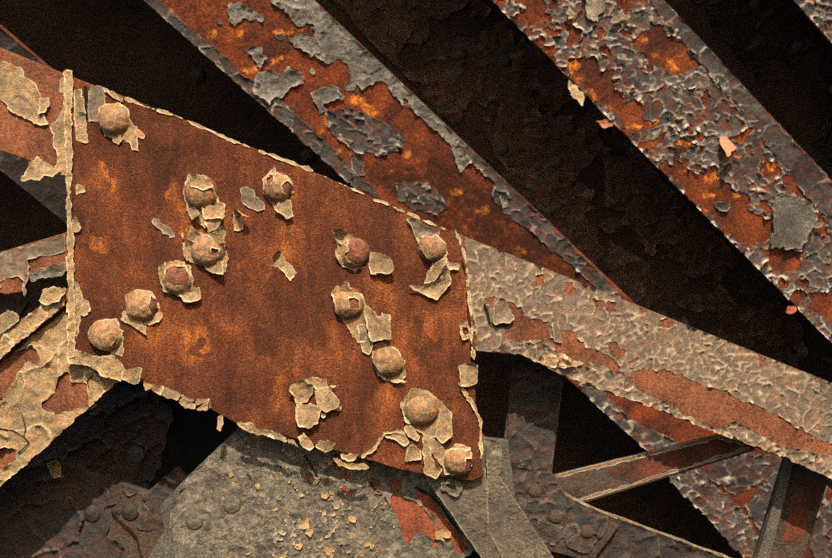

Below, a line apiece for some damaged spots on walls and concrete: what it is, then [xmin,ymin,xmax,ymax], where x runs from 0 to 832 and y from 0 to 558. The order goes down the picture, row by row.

rust [350,96,376,116]
peeling [152,172,229,302]
rust [376,152,589,284]